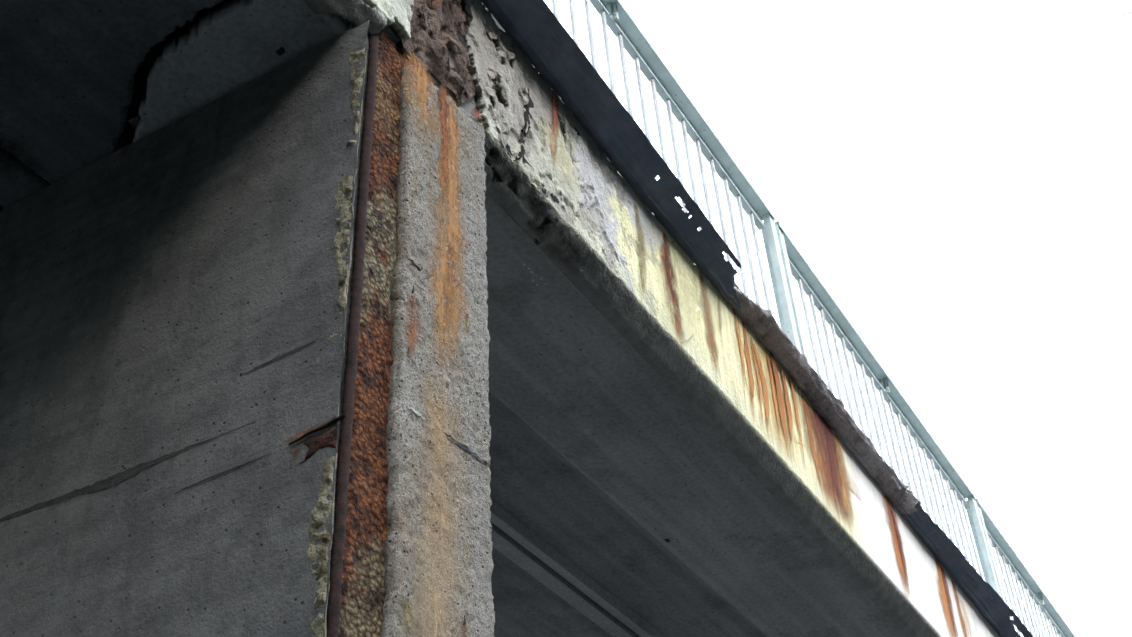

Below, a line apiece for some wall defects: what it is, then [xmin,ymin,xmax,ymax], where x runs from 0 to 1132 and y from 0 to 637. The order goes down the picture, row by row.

spalling [288,0,516,637]
corrosion [409,56,463,348]
corrosion [635,205,645,290]
corrosion [660,234,683,337]
corrosion [700,274,852,517]
corrosion [883,495,907,587]
corrosion [935,557,967,637]